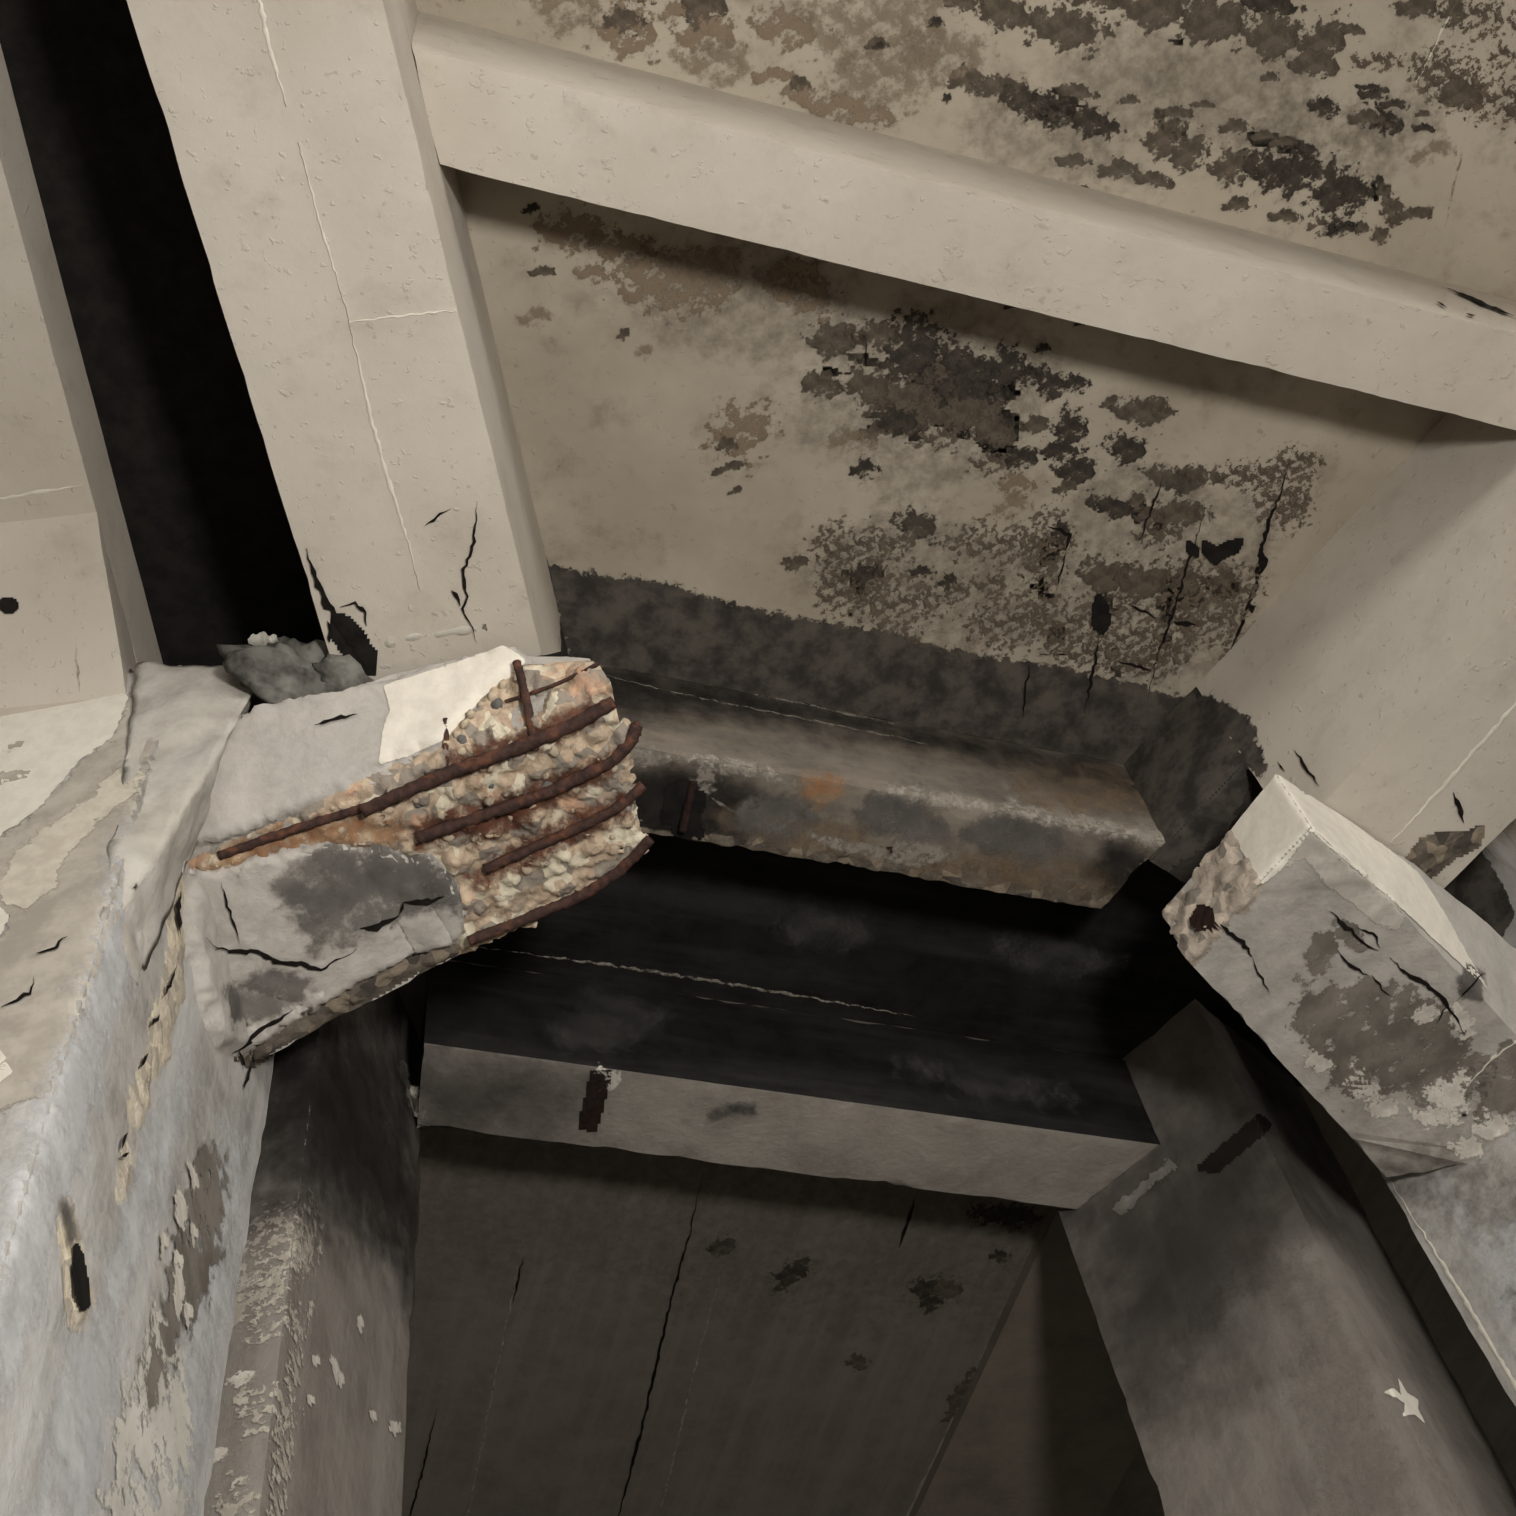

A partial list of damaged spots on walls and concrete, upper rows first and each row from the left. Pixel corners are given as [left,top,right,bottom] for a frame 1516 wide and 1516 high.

crack [306,548,378,676]
crack [425,507,477,642]
corrosion [447,698,597,779]
leakage [547,563,1268,896]
corrosion [210,752,633,890]
peeling [0,692,157,1114]
crack [206,884,444,971]
spalling [115,659,674,1206]
spalling [1162,830,1265,967]
peeling [1285,919,1516,1160]
crack [1330,911,1485,1035]
peeling [97,1139,345,1516]